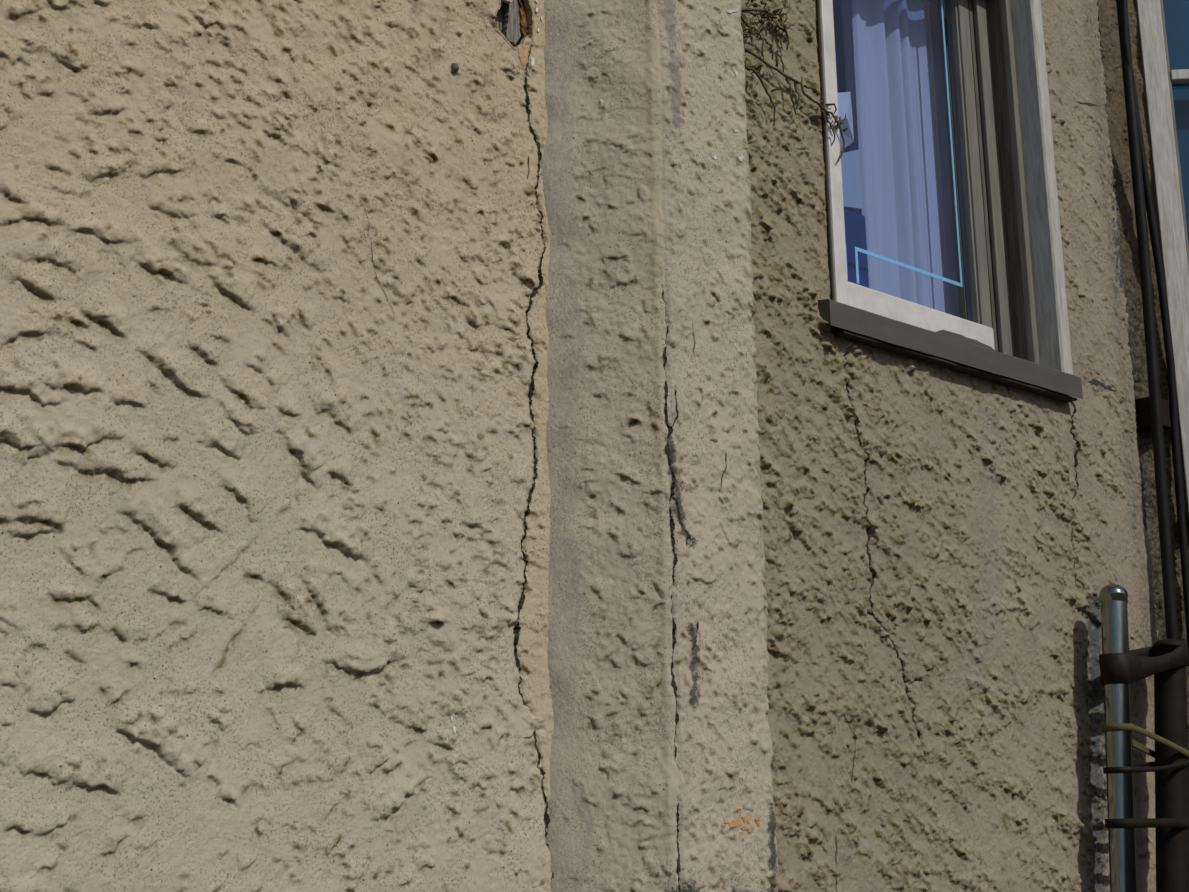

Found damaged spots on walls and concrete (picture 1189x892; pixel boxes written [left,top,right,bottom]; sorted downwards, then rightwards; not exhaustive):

spalling [492,0,543,77]
crack [513,48,554,878]
crack [662,291,699,769]
crack [844,344,927,762]
crack [842,711,857,785]
crack [675,800,683,892]
corrosion [721,808,761,841]
crack [816,835,840,892]